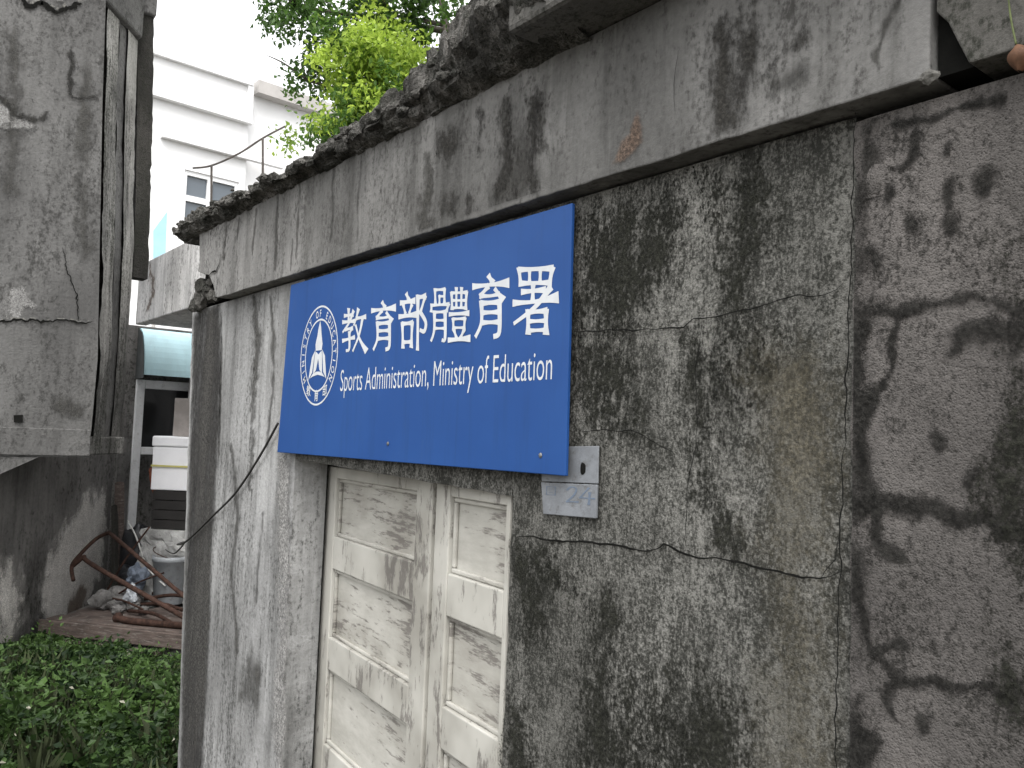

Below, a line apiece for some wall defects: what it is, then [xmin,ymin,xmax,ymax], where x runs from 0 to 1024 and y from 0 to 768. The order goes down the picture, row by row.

crack [0,247,92,324]
spalling [188,275,232,312]
spalling [172,0,592,246]
water stain [418,126,478,229]
water stain [491,88,549,205]
water stain [569,153,788,570]
crack [518,112,857,768]
water stain [849,117,1024,768]
water stain [890,92,1007,172]
water stain [509,538,763,768]